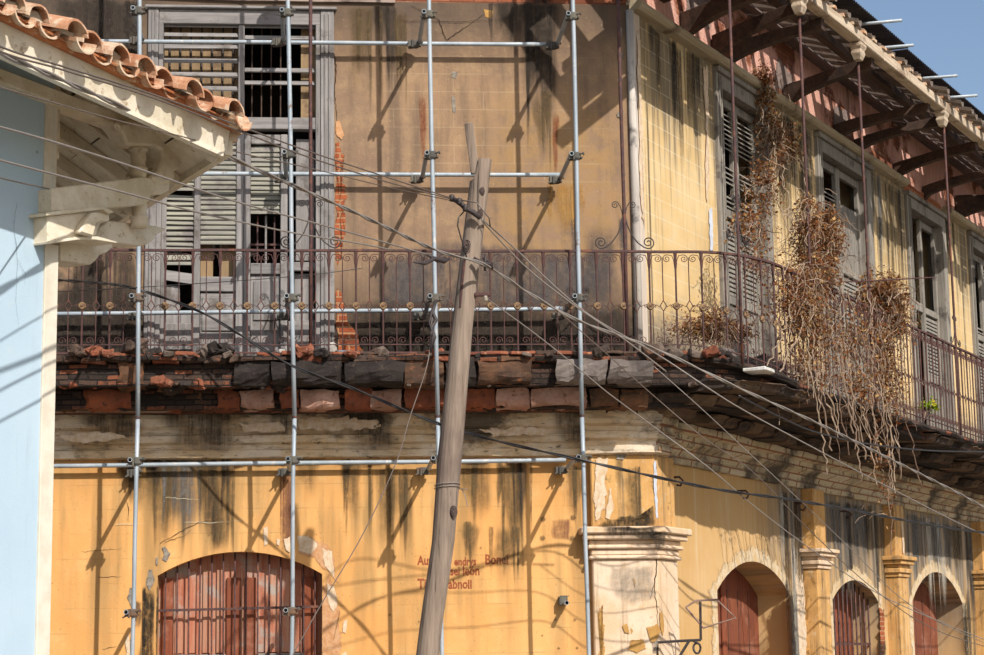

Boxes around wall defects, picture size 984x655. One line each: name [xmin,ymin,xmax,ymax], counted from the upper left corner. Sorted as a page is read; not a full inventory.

damp [489,0,557,155]
flaking render [334,120,347,264]
peeling [58,431,125,443]
damp [121,414,235,542]
peeling [298,415,381,432]
damp [344,459,410,541]
damp [463,463,532,566]
damp [556,412,581,442]
peeling [593,454,627,520]
damp [136,588,159,655]
peeling [264,526,347,655]
peeling [623,612,664,653]